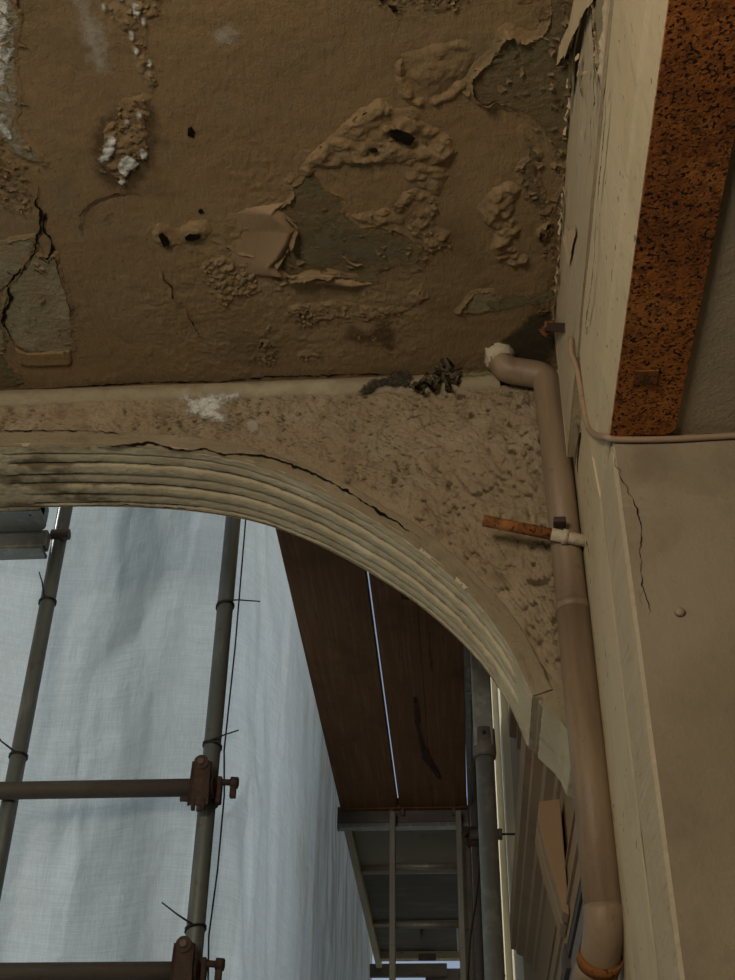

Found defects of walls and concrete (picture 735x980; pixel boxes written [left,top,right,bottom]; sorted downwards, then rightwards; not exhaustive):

water stain [0,113,11,139]
water stain [0,0,14,101]
peeling [0,0,53,214]
peeling [0,233,77,387]
crack [1,188,82,339]
peeling [270,149,434,291]
peeling [462,0,608,315]